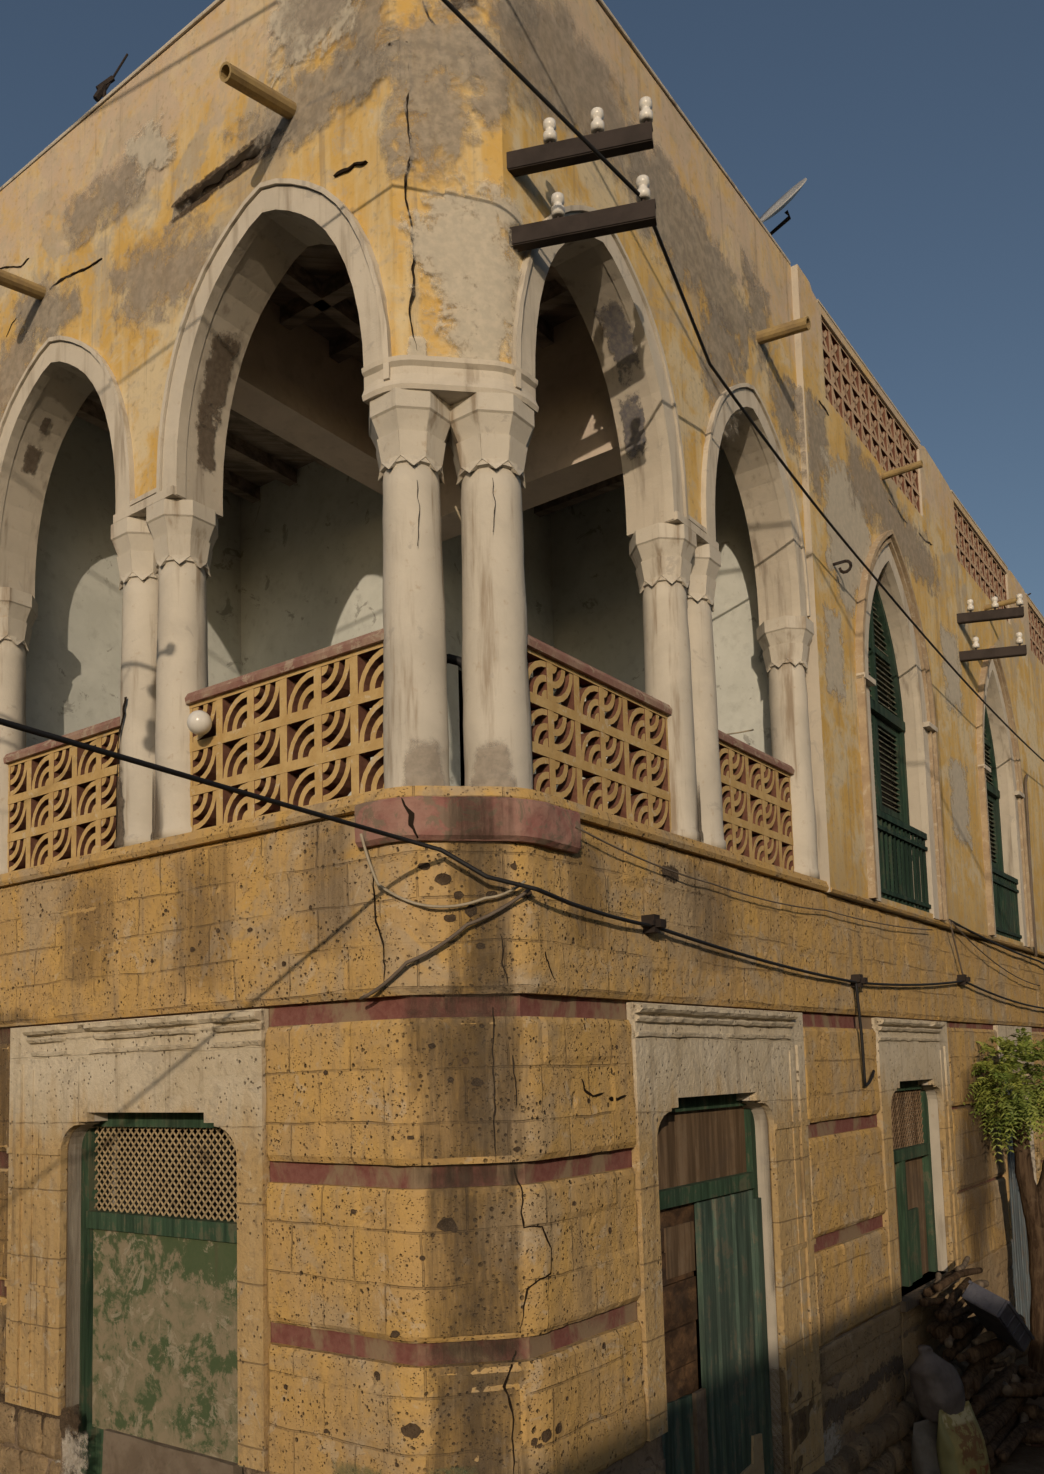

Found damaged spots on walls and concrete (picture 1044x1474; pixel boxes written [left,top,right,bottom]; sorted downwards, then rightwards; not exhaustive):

peeling [65,115,176,249]
crack [333,160,368,177]
peeling [109,0,632,361]
crack [381,0,478,349]
peeling [195,333,240,472]
peeling [594,301,646,460]
peeling [607,142,939,702]
peeling [404,741,444,786]
peeling [471,743,516,787]
crack [581,1079,627,1101]
water stain [0,1011,265,1474]
crack [492,934,552,1474]